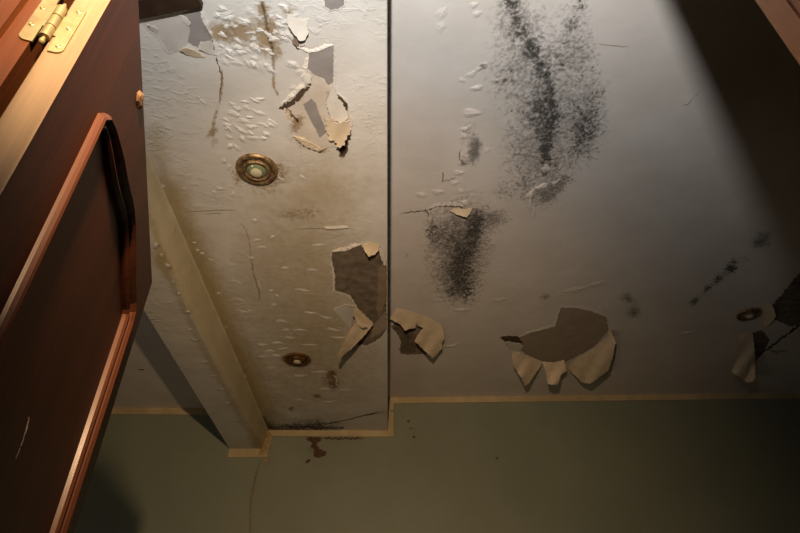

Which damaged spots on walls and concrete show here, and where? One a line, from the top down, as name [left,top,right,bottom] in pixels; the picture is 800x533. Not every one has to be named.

peeling [279,14,354,157]
damp [505,0,604,177]
peeling [330,242,444,359]
damp [427,207,499,300]
peeling [500,305,616,386]
peeling [732,274,800,382]